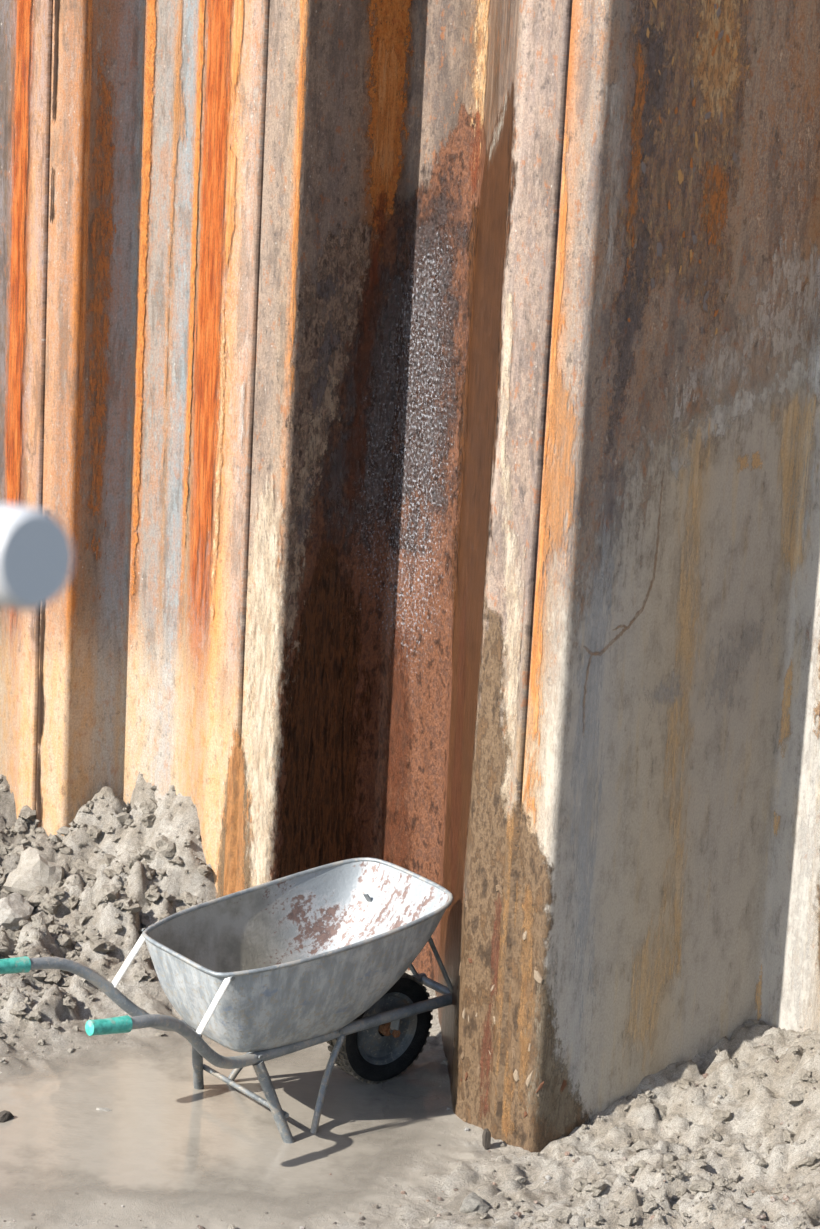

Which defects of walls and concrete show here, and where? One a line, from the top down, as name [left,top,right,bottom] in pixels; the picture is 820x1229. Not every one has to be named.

corrosion [5,0,33,505]
corrosion [130,0,156,595]
corrosion [166,0,244,618]
corrosion [276,0,413,694]
damp [245,84,820,1137]
corrosion [523,95,580,823]
crack [583,471,664,733]
peeling [454,1008,491,1082]
peeling [512,1044,544,1093]